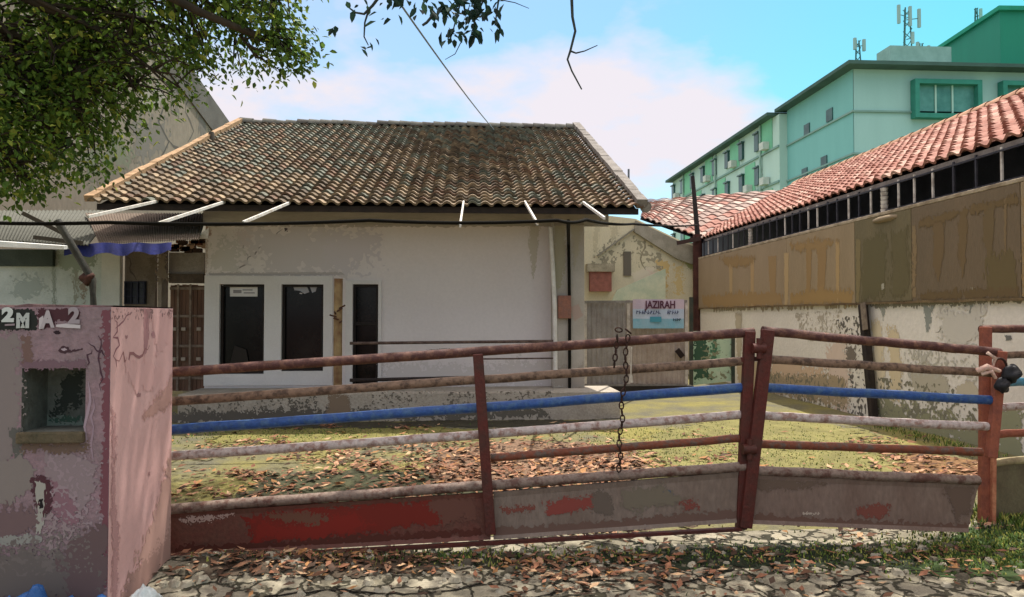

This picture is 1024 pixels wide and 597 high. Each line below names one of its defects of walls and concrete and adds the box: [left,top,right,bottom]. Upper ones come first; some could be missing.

crack [86,314,150,390]
spalling [909,360,978,404]
peeling [29,447,103,550]